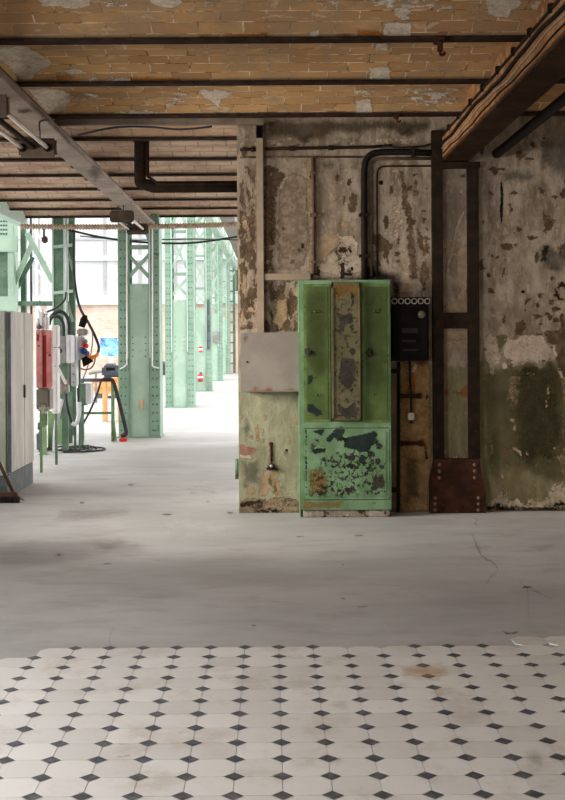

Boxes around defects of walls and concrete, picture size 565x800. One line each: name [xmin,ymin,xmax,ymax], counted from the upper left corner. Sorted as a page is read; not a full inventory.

peeling [0,46,100,114]
peeling [118,89,234,114]
peeling [404,87,461,106]
peeling [238,145,361,332]
peeling [482,290,565,475]
spalling [240,414,266,459]